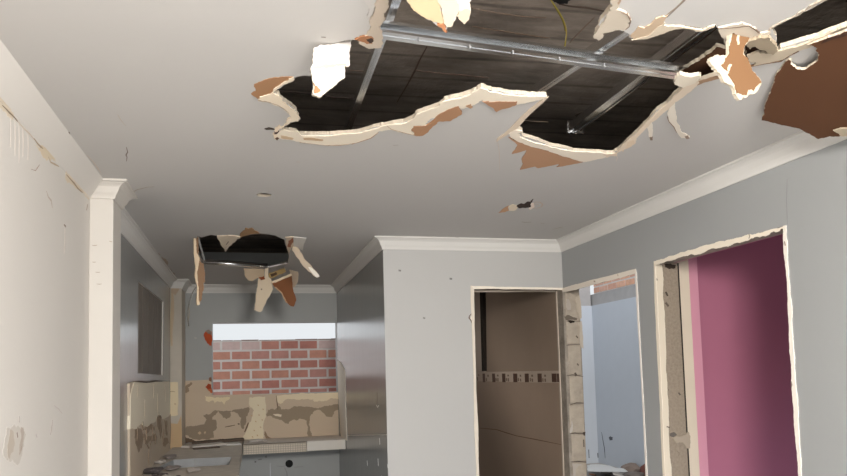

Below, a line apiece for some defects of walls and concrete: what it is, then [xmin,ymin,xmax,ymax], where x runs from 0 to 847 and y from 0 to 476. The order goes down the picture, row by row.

spalling [359,0,389,49]
spalling [593,0,630,41]
spalling [632,0,847,66]
spalling [258,71,701,162]
spalling [508,199,534,211]
spalling [217,235,240,252]
peeling [285,236,306,255]
spalling [185,404,338,440]